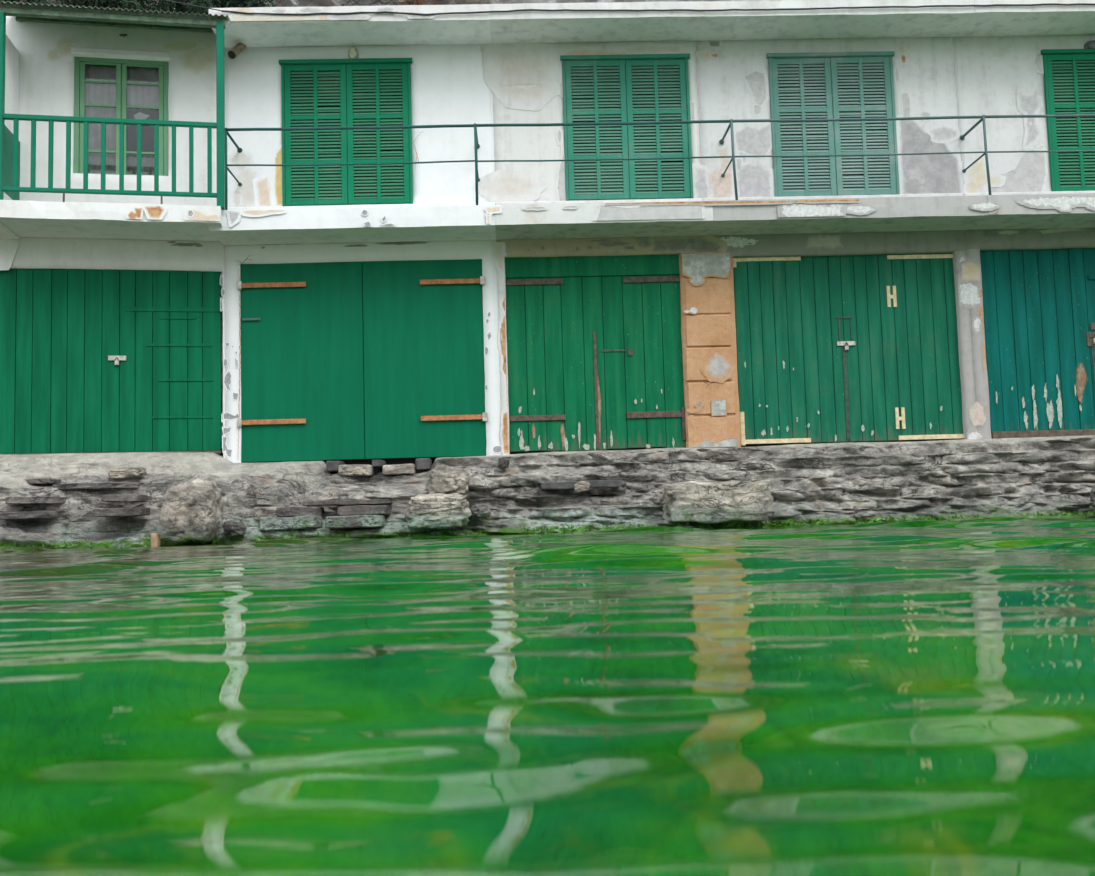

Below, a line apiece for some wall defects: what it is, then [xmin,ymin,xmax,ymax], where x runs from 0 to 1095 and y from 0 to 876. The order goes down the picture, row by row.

peeling [592,69,877,221]
peeling [894,67,964,194]
peeling [970,52,1095,212]
peeling [221,342,240,458]
peeling [484,274,522,413]
peeling [517,378,613,451]
peeling [958,281,987,374]
flaking render [967,391,998,439]
peeling [1011,374,1062,429]
peeling [1074,364,1087,412]